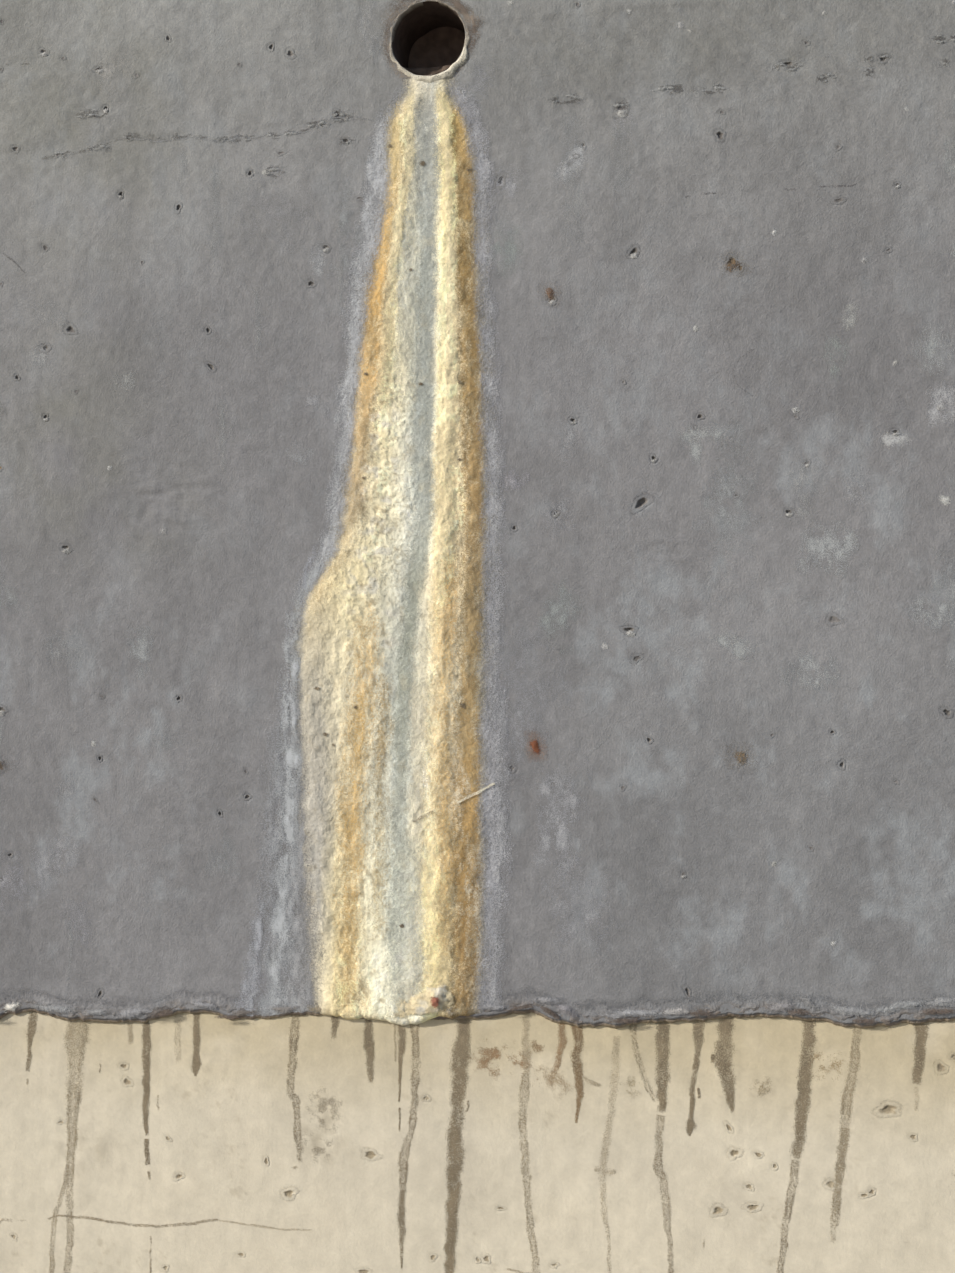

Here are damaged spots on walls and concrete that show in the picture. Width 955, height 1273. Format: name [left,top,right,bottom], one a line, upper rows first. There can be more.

damp [26,1011,38,1083]
damp [49,1020,92,1273]
damp [127,1021,152,1180]
damp [173,1013,201,1076]
damp [545,1021,674,1273]
damp [686,1016,736,1136]
damp [777,1021,817,1273]
damp [830,1027,863,1244]
damp [911,1022,929,1111]
crack [0,1214,312,1273]